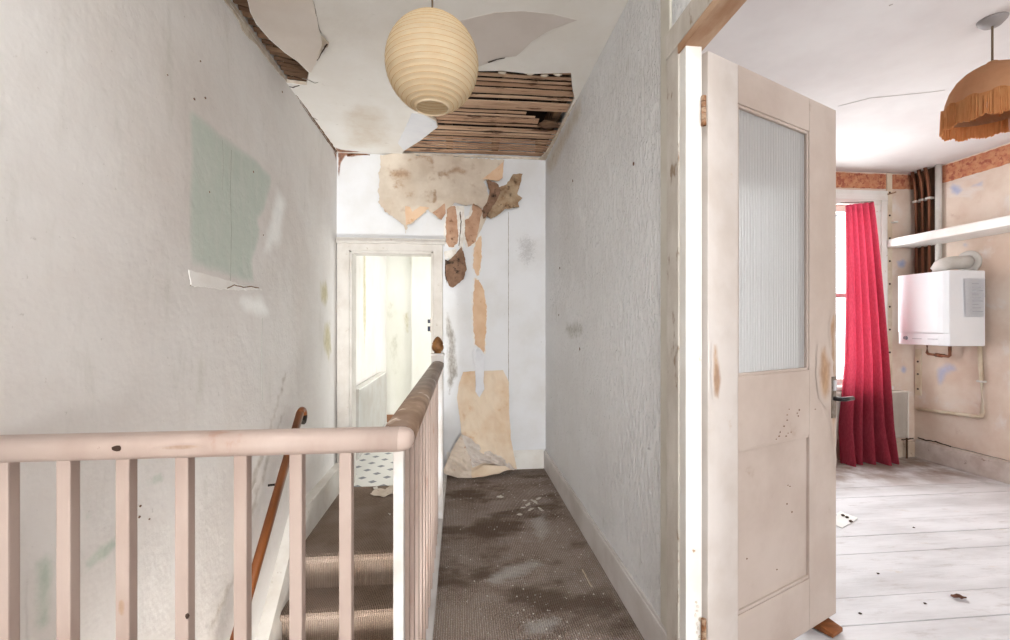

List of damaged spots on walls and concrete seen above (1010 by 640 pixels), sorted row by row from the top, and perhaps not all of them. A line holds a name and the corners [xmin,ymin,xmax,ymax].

flaking render [224,0,308,82]
flaking render [398,11,577,181]
peeling [188,270,261,291]
peeling [444,204,488,354]